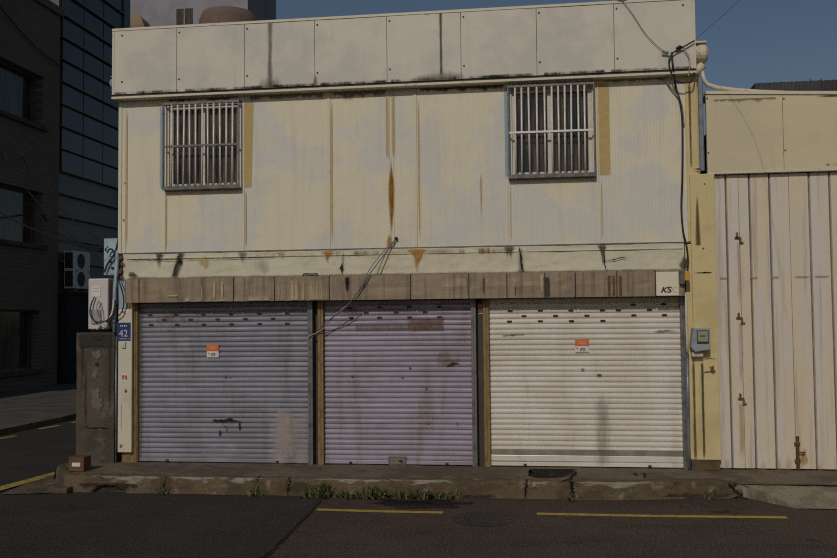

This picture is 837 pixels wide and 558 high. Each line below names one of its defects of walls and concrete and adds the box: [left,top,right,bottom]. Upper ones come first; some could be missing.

leakage [418,13,459,81]
leakage [240,53,399,89]
corrosion [408,249,425,265]